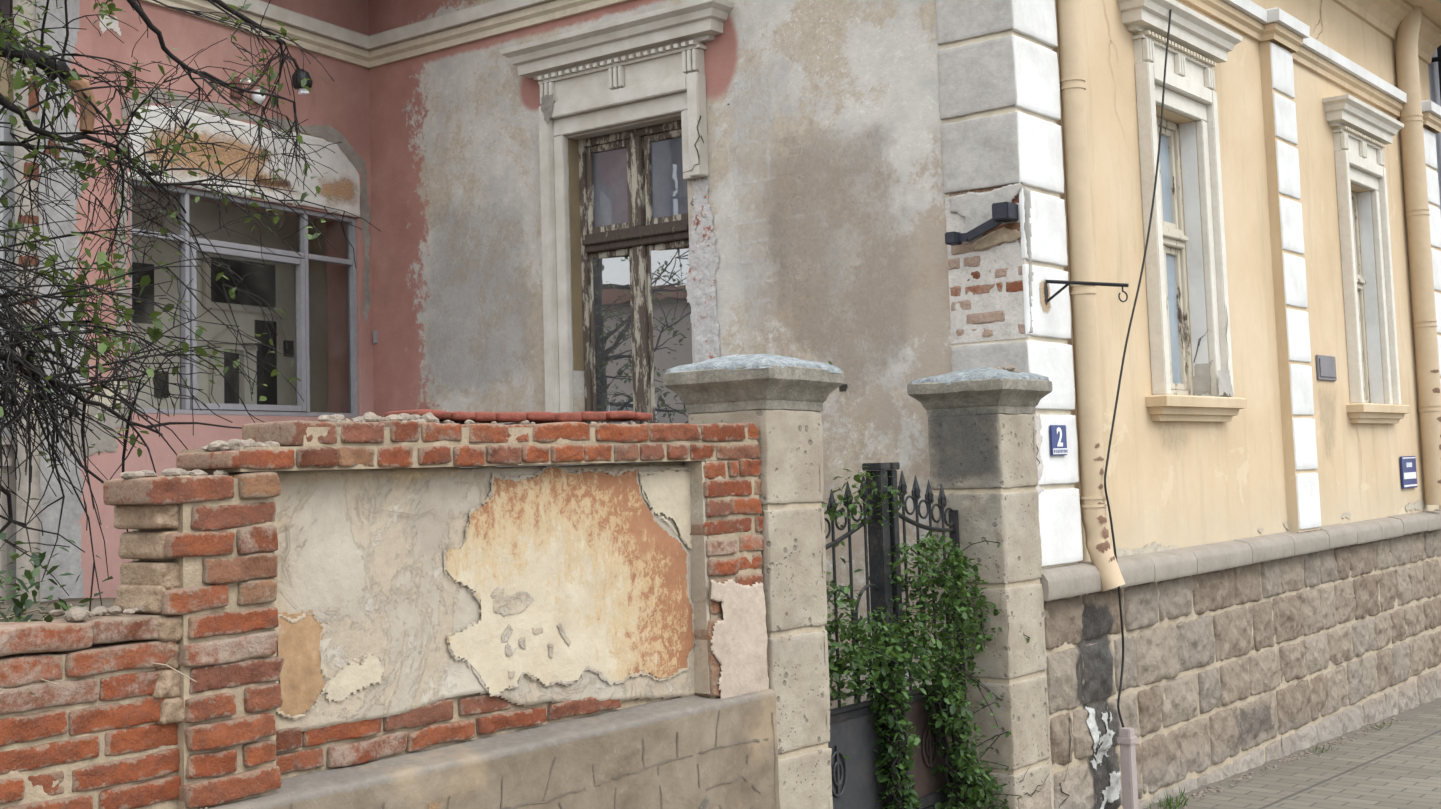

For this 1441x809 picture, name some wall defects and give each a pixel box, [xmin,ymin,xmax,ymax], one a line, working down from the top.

spalling [541,93,553,124]
crack [683,115,704,230]
spalling [945,183,1034,344]
rust [1094,443,1115,562]
peeling [443,464,695,697]
peeling [275,609,385,720]
damp [1076,605,1121,809]